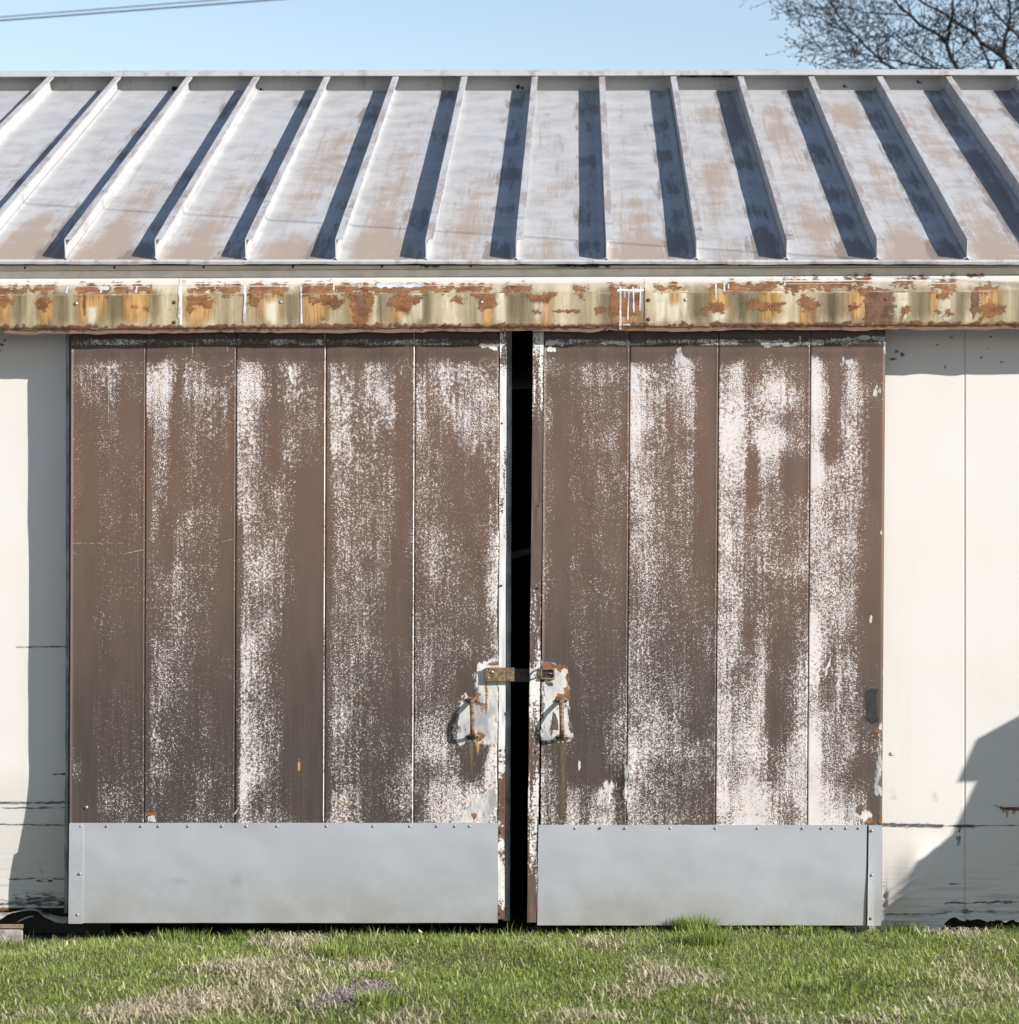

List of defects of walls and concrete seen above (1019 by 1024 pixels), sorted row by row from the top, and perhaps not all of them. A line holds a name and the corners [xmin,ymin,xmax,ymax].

rust [0,270,1019,333]
peeling [545,339,565,352]
peeling [670,347,693,369]
peeling [761,336,811,348]
peeling [831,335,904,361]
peeling [455,655,499,752]
peeling [540,661,573,743]
peeling [874,723,894,796]
peeling [595,765,629,812]
peeling [460,790,498,823]
peeling [848,804,882,825]